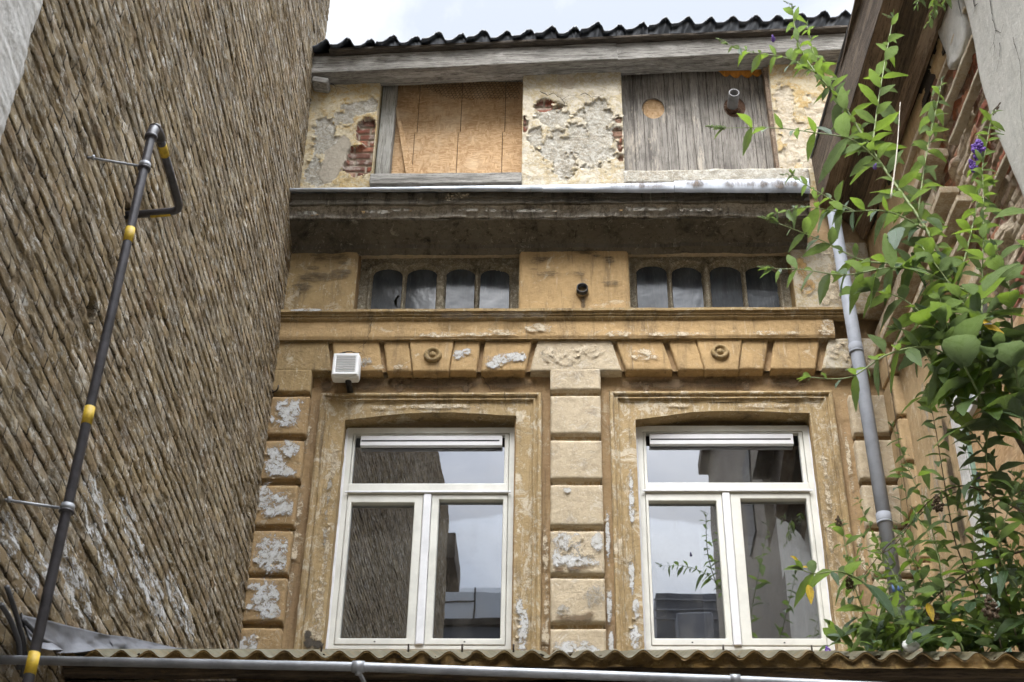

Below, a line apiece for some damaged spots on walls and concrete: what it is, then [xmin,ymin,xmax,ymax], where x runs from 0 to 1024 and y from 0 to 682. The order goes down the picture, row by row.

peeling [303,97,378,187]
spalling [522,98,624,181]
peeling [485,352,527,368]
peeling [246,399,312,619]
peeling [515,599,529,651]
peeling [542,511,614,654]